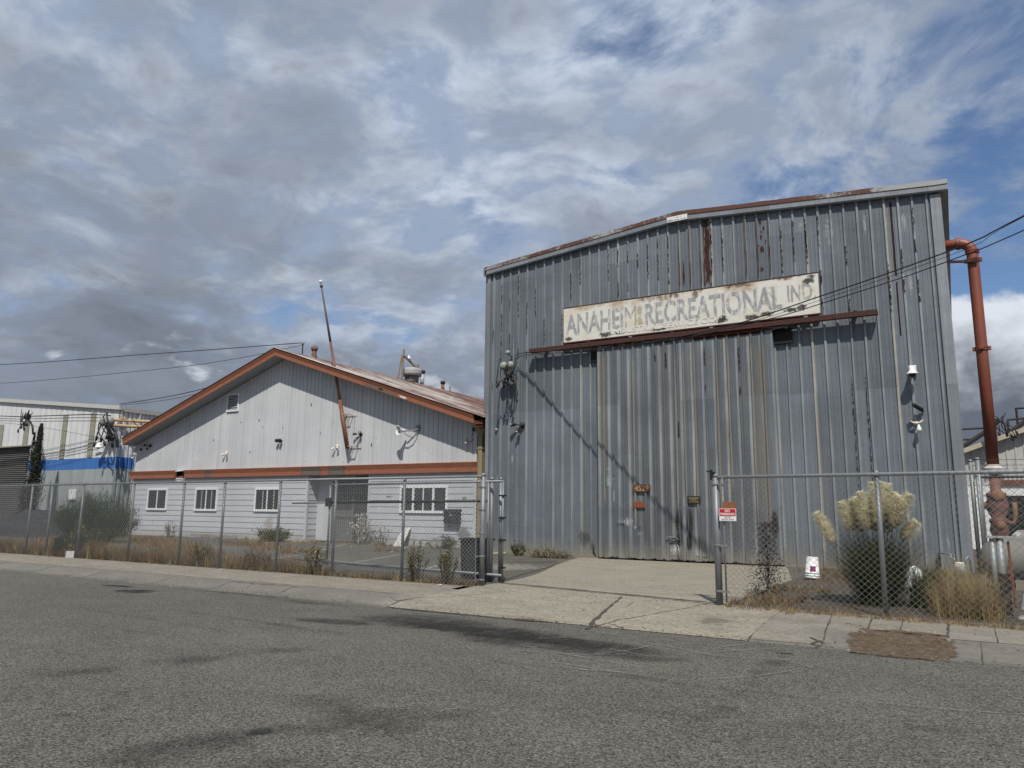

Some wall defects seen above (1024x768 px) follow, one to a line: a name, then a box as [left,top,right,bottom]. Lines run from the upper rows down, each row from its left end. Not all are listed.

rust [641,221,711,300]
rust [889,203,902,336]
peeling [746,304,806,319]
crack [585,596,704,631]